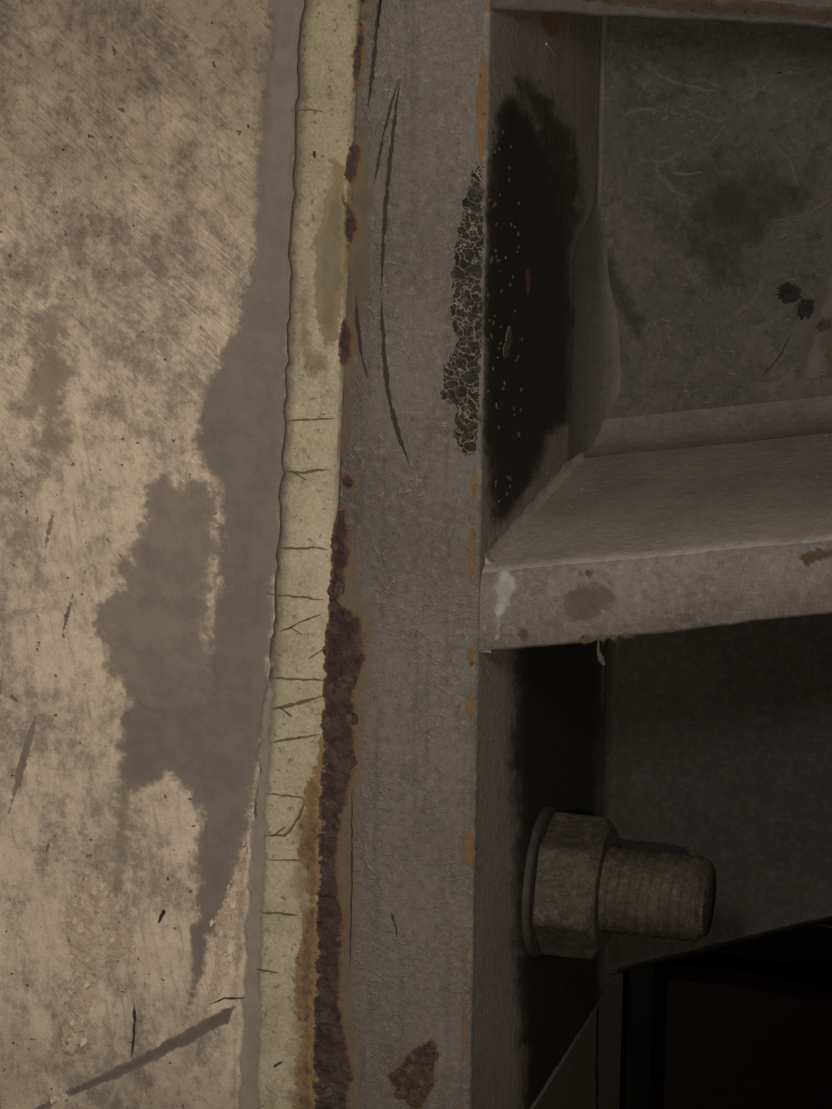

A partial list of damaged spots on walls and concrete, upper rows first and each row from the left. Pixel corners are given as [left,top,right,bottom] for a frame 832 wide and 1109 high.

rust [582,0,832,23]
rust [352,19,365,92]
rust [344,142,363,183]
water stain [517,79,584,242]
rust [342,194,359,252]
rust [338,319,354,366]
water stain [93,0,303,996]
rust [292,507,367,1109]
crack [130,1004,138,1057]
rust [387,1039,439,1109]